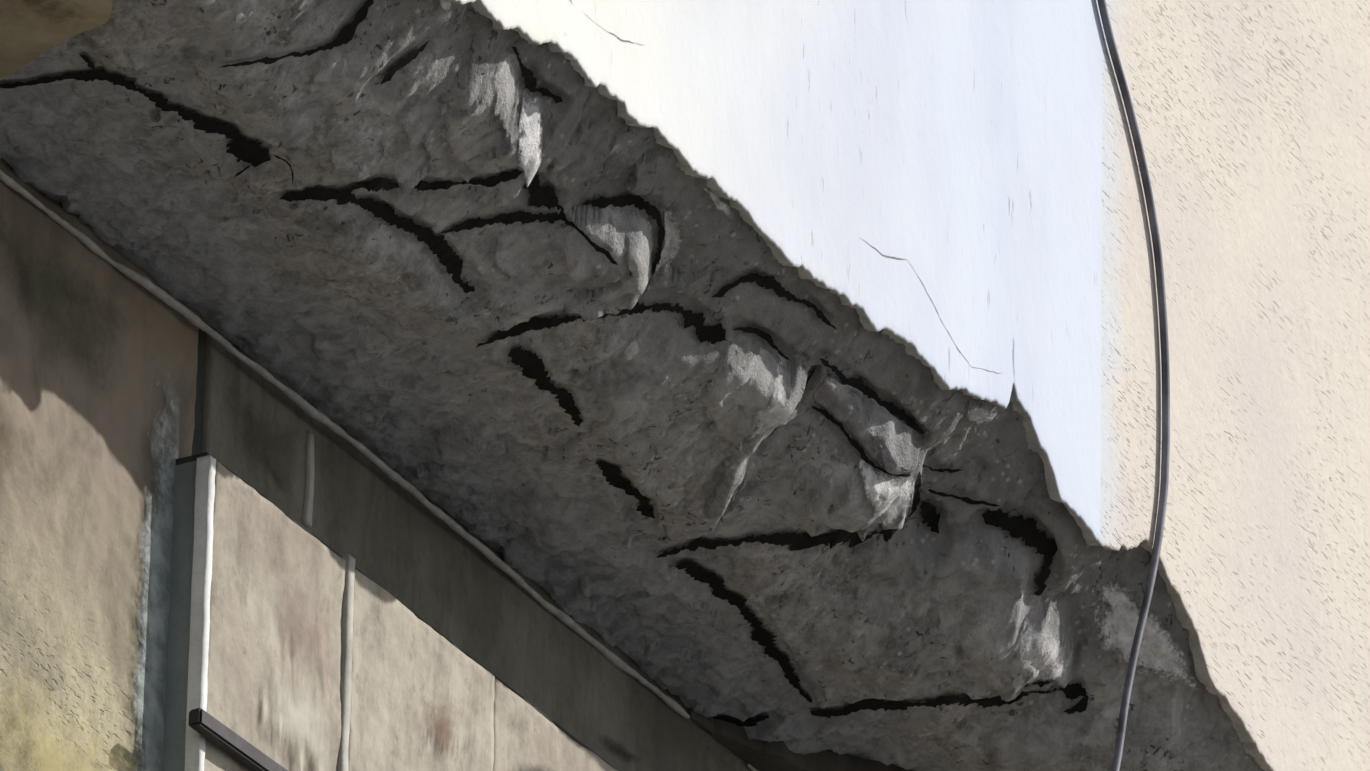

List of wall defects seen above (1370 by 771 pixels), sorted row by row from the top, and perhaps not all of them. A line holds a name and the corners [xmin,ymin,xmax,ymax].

crack [221,0,374,67]
crack [0,40,1089,718]
spalling [814,378,917,475]
spalling [1119,569,1264,771]
crack [713,715,782,742]